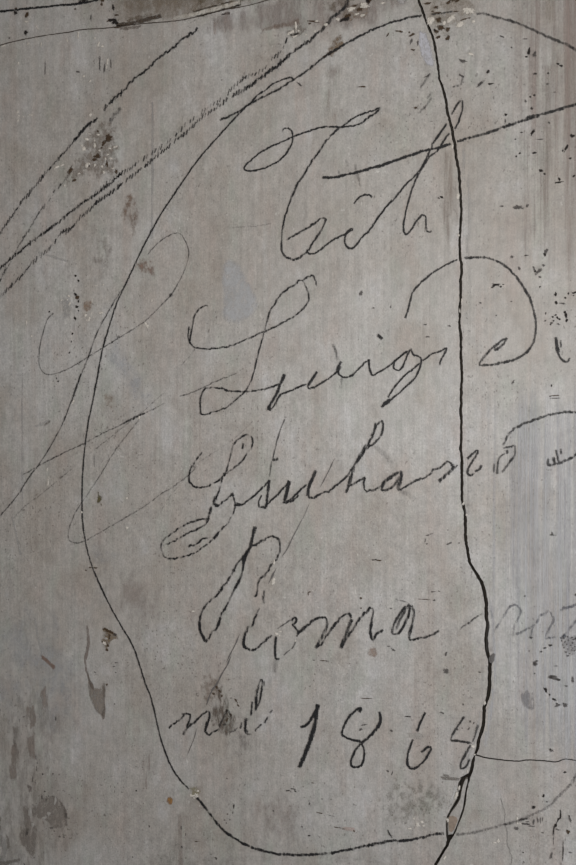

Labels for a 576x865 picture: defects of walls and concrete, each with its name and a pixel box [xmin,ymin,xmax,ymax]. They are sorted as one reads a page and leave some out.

crack [417,0,576,865]